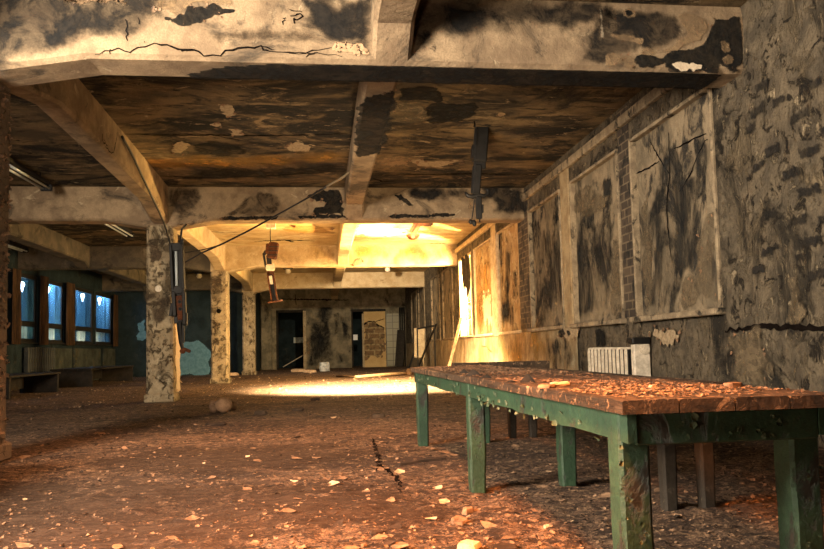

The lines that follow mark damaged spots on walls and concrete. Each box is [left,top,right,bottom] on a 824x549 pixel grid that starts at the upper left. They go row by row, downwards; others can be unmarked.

crack [95,18,342,57]
leakage [599,9,655,55]
spalling [188,16,743,169]
peeling [171,141,190,156]
leakage [577,177,612,316]
leakage [649,138,706,304]
spalling [364,321,386,360]
crack [372,438,402,493]